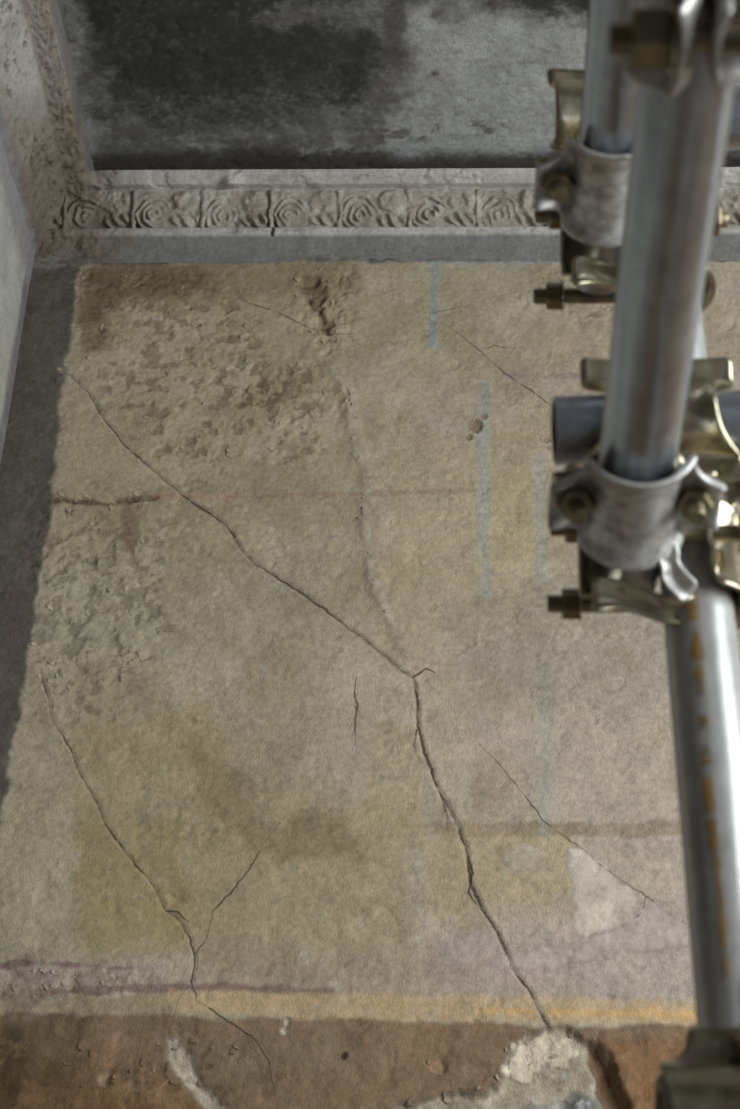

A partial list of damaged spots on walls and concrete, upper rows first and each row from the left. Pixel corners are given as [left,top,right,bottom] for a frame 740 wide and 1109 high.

leakage [92,130,559,171]
leakage [723,152,740,167]
crack [59,368,147,465]
crack [180,493,557,1034]
crack [480,744,577,845]
crack [105,824,143,873]
crack [167,910,275,1090]
flaking render [167,1038,228,1109]
spalling [393,1027,628,1109]